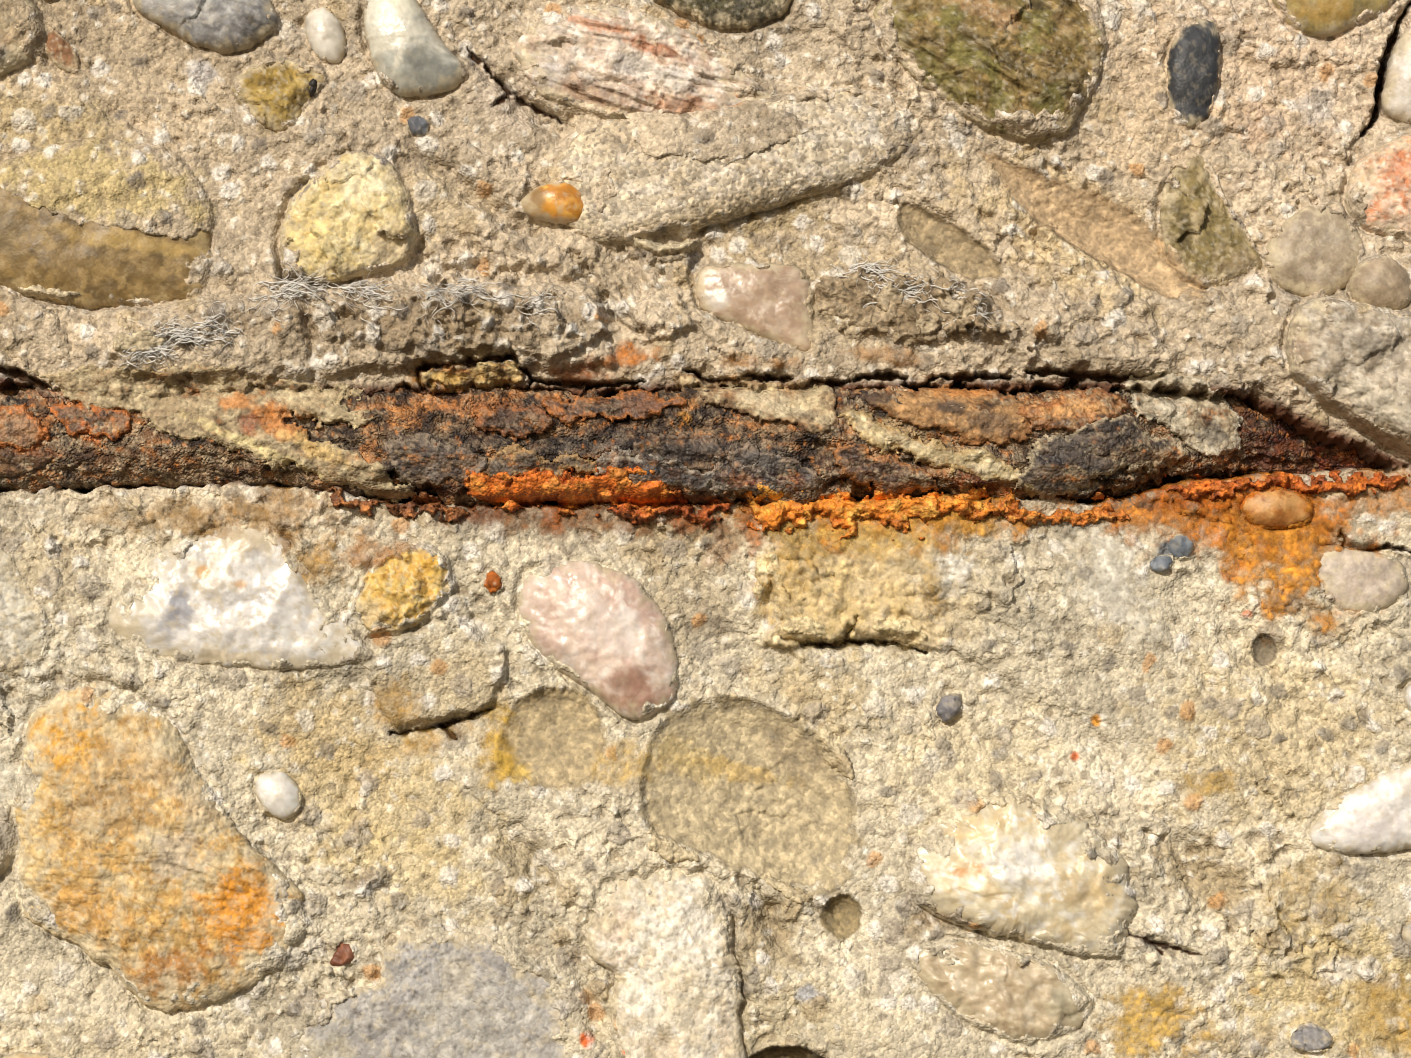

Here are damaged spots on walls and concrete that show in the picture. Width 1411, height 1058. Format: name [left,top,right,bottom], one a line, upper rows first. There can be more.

crack [1360,2,1411,137]
crack [0,367,57,392]
crack [416,352,645,390]
corrosion [563,342,646,377]
crack [683,367,1163,388]
spalling [0,329,1410,650]
corrosion [470,503,650,535]
corrosion [740,498,1001,632]
corrosion [1096,473,1411,620]